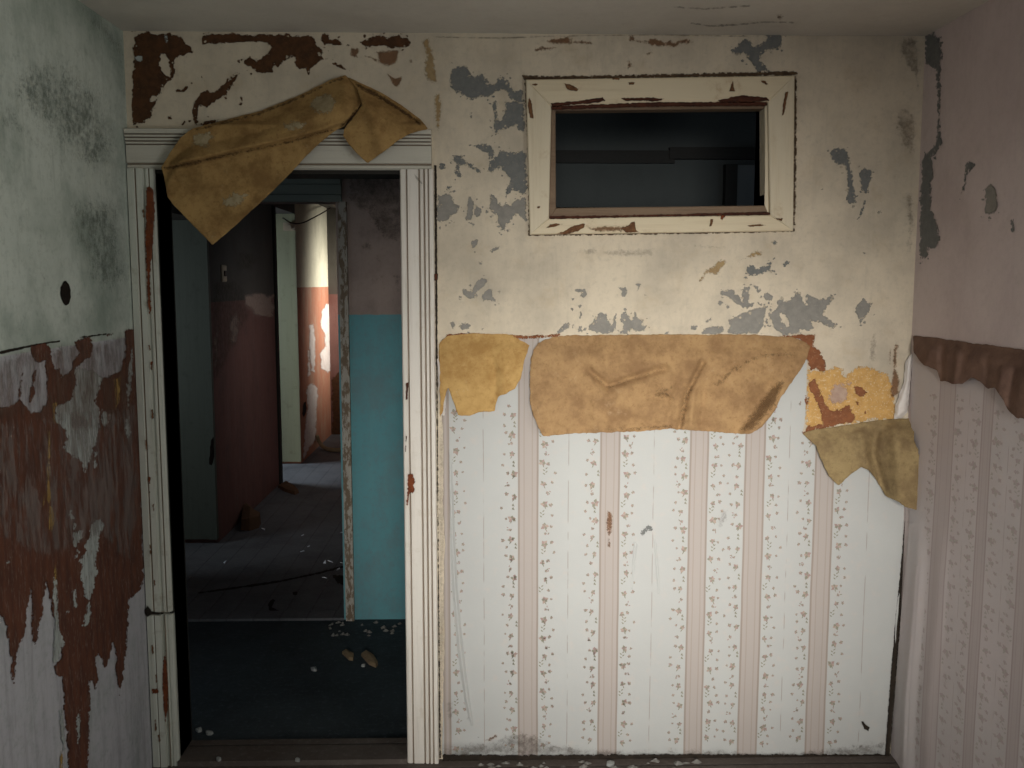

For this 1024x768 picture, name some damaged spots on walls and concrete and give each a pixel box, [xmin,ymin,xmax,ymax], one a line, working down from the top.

peeling [132,31,412,128]
peeling [551,35,783,110]
peeling [437,62,540,253]
peeling [827,146,874,220]
peeling [919,32,943,264]
peeling [547,211,783,234]
peeling [459,239,500,306]
peeling [512,283,648,339]
peeling [0,328,156,768]